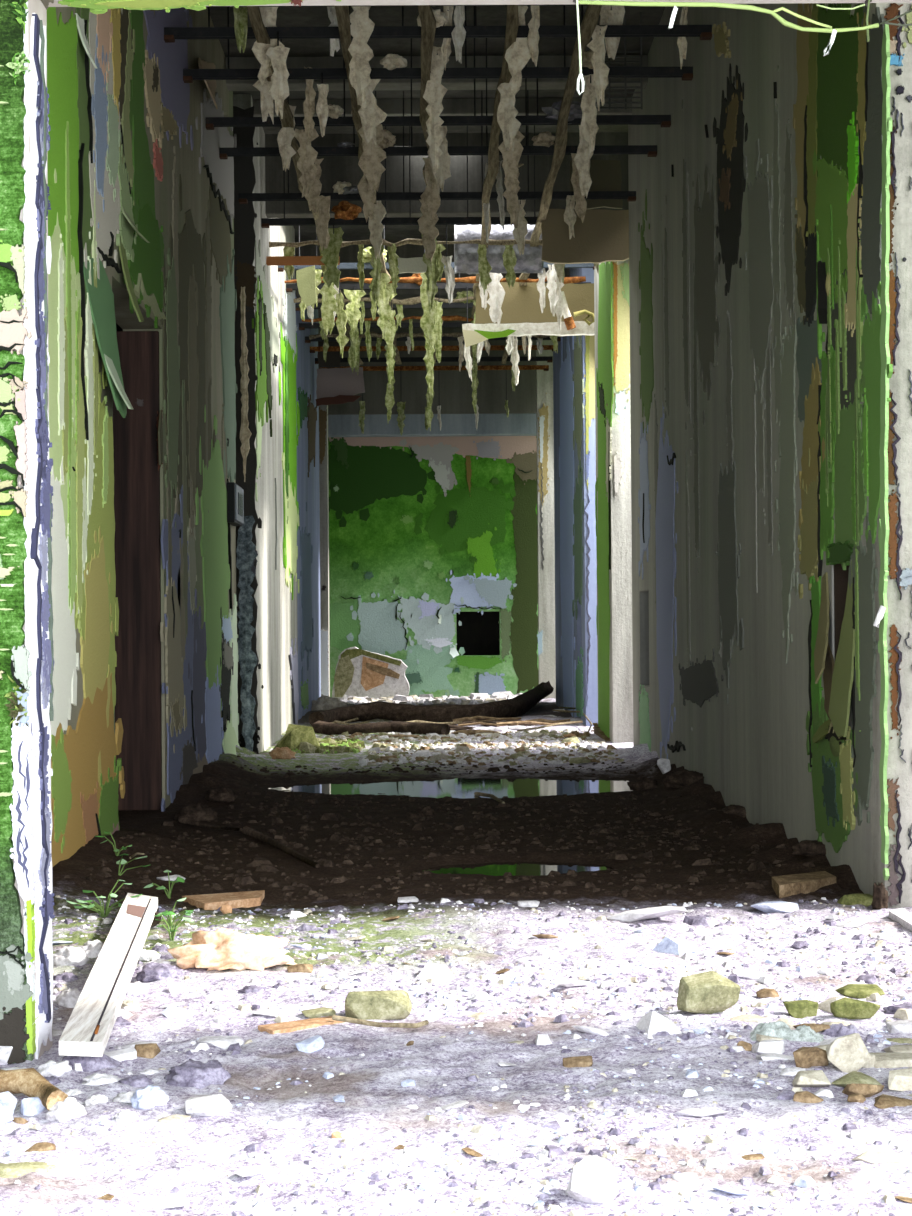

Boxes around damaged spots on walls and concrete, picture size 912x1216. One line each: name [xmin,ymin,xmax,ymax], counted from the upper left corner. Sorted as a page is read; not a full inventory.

peeling [75,7,237,418]
peeling [160,485,239,812]
flaking render [263,288,297,437]
peeling [307,395,545,696]
peeling [572,335,584,484]
damp [559,3,893,880]
corrosion [889,120,898,374]
corrosion [888,389,901,589]
corrosion [888,624,902,739]